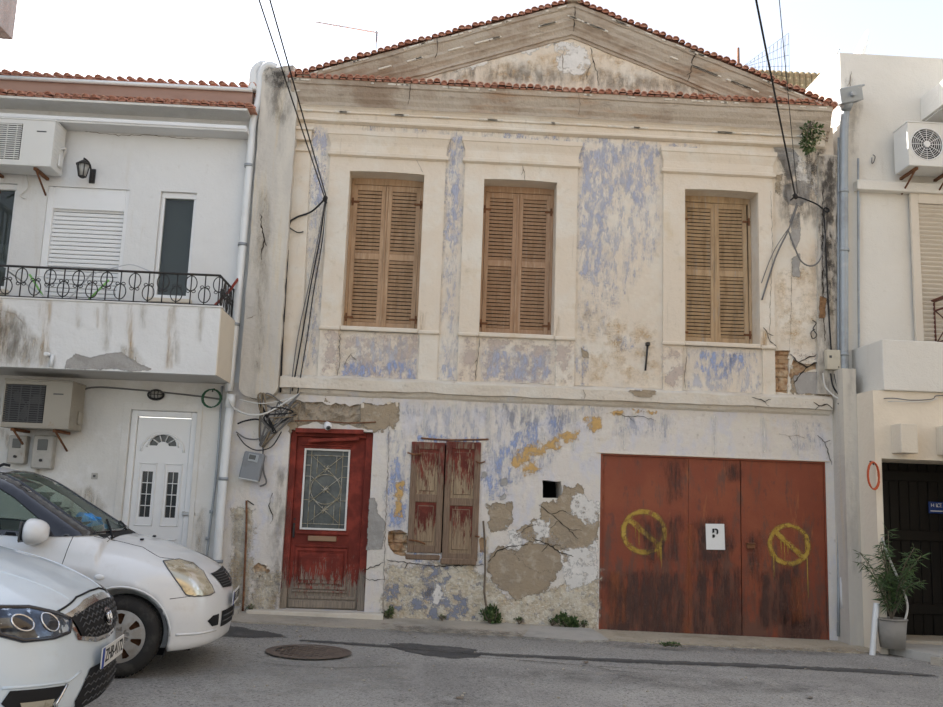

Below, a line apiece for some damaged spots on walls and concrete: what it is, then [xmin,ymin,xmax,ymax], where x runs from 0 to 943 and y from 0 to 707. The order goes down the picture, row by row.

peeling [521,41,591,80]
peeling [579,139,658,288]
flaking render [65,352,151,371]
peeling [442,339,589,383]
flaking render [629,390,656,398]
peeling [662,350,758,390]
flaking render [775,351,832,397]
flaking render [284,398,409,440]
peeling [366,406,817,639]
peeling [229,507,281,609]